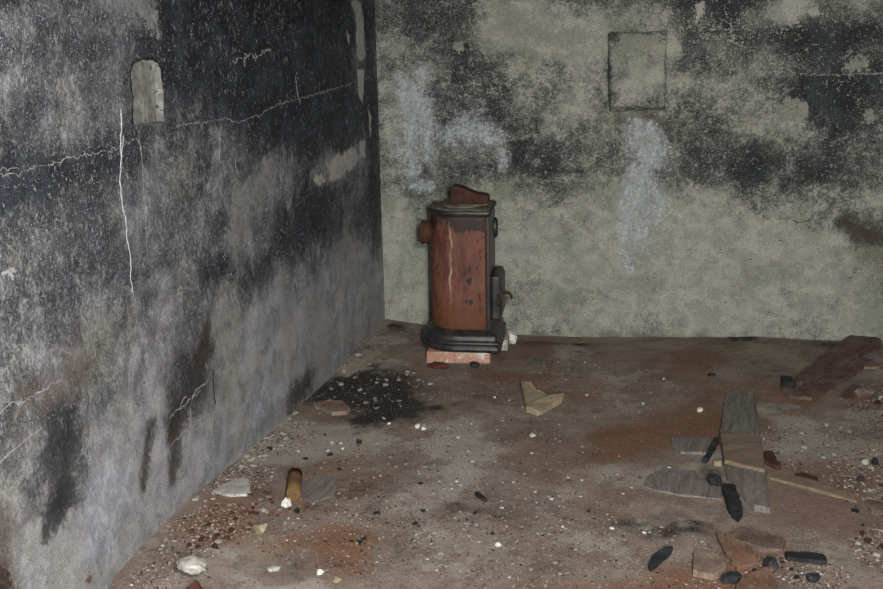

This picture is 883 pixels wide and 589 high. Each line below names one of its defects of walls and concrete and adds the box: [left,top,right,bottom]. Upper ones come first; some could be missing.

crack [233,48,271,64]
crack [0,57,162,292]
crack [176,75,369,173]
leakage [394,67,508,191]
leakage [617,117,672,272]
leakage [839,213,883,248]
crack [0,378,63,463]
leakage [40,321,214,563]
crack [168,369,216,452]